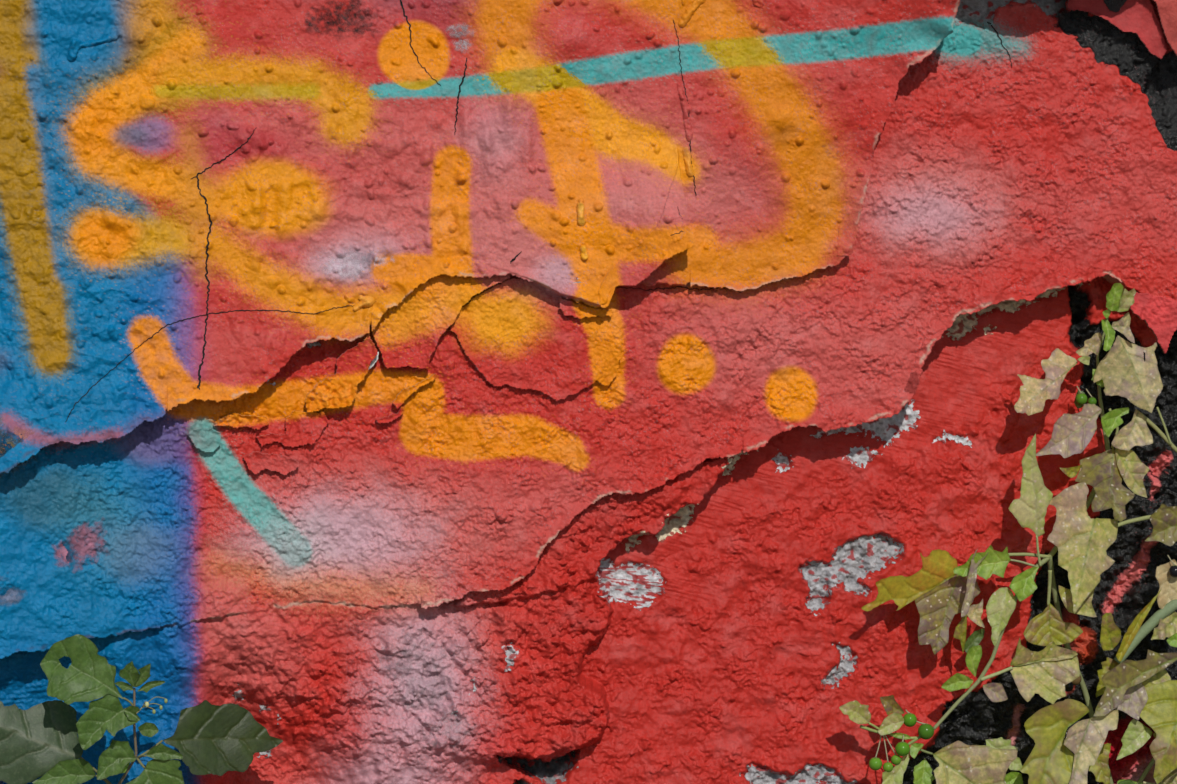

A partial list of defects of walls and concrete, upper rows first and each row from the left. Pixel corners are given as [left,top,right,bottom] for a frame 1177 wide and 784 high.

crack [65,128,353,422]
peeling [0,166,695,475]
crack [400,0,467,133]
peeling [690,0,1177,291]
peeling [421,260,1177,784]